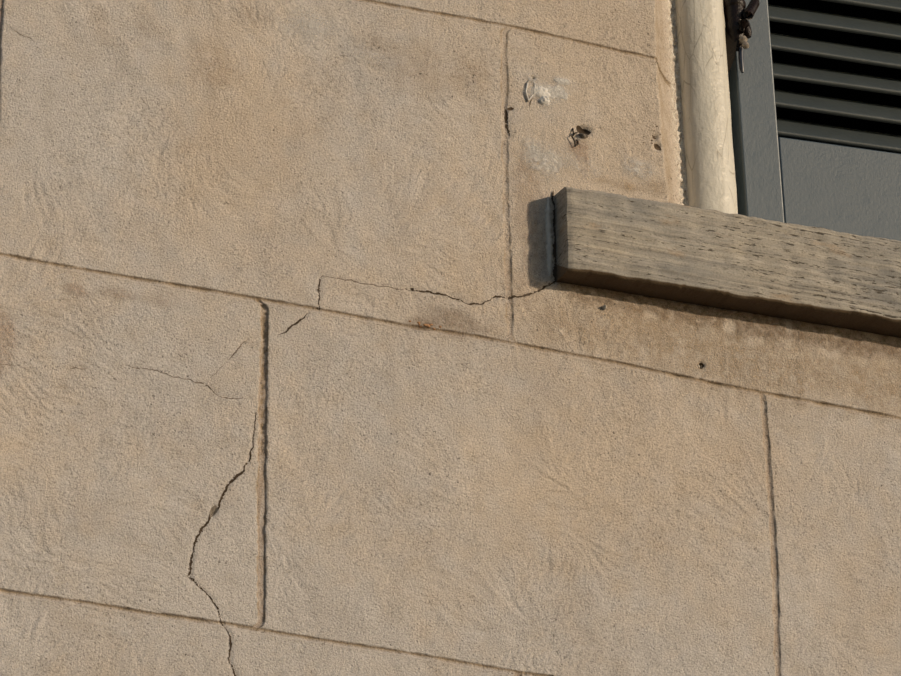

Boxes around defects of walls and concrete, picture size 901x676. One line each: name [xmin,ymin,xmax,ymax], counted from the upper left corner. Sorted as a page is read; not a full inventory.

crack [281,191,557,334]
crack [124,341,256,676]